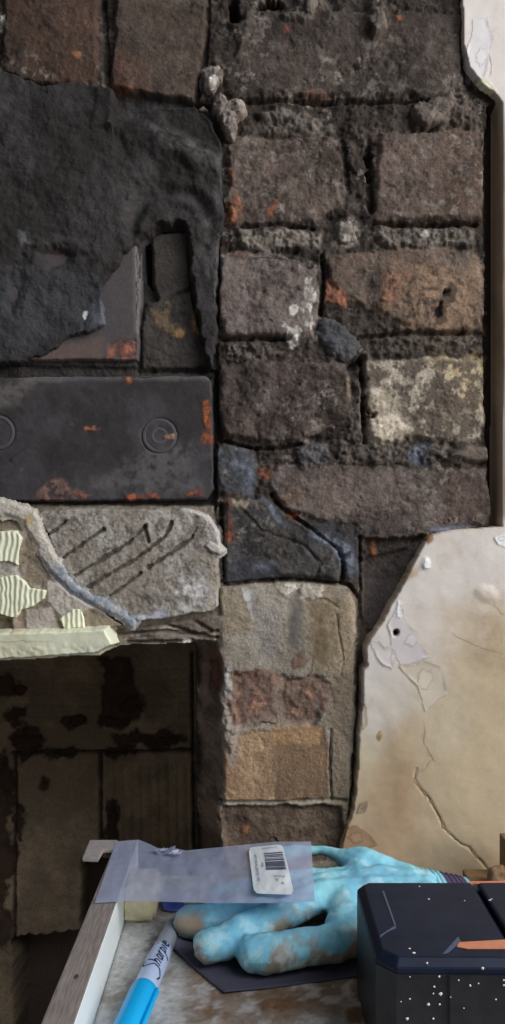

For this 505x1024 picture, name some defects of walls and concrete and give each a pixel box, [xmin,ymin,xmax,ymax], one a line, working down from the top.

spalling [149,301,186,338]
spalling [106,340,136,361]
peeling [370,600,430,669]
crack [413,730,487,868]
water stain [107,808,119,841]